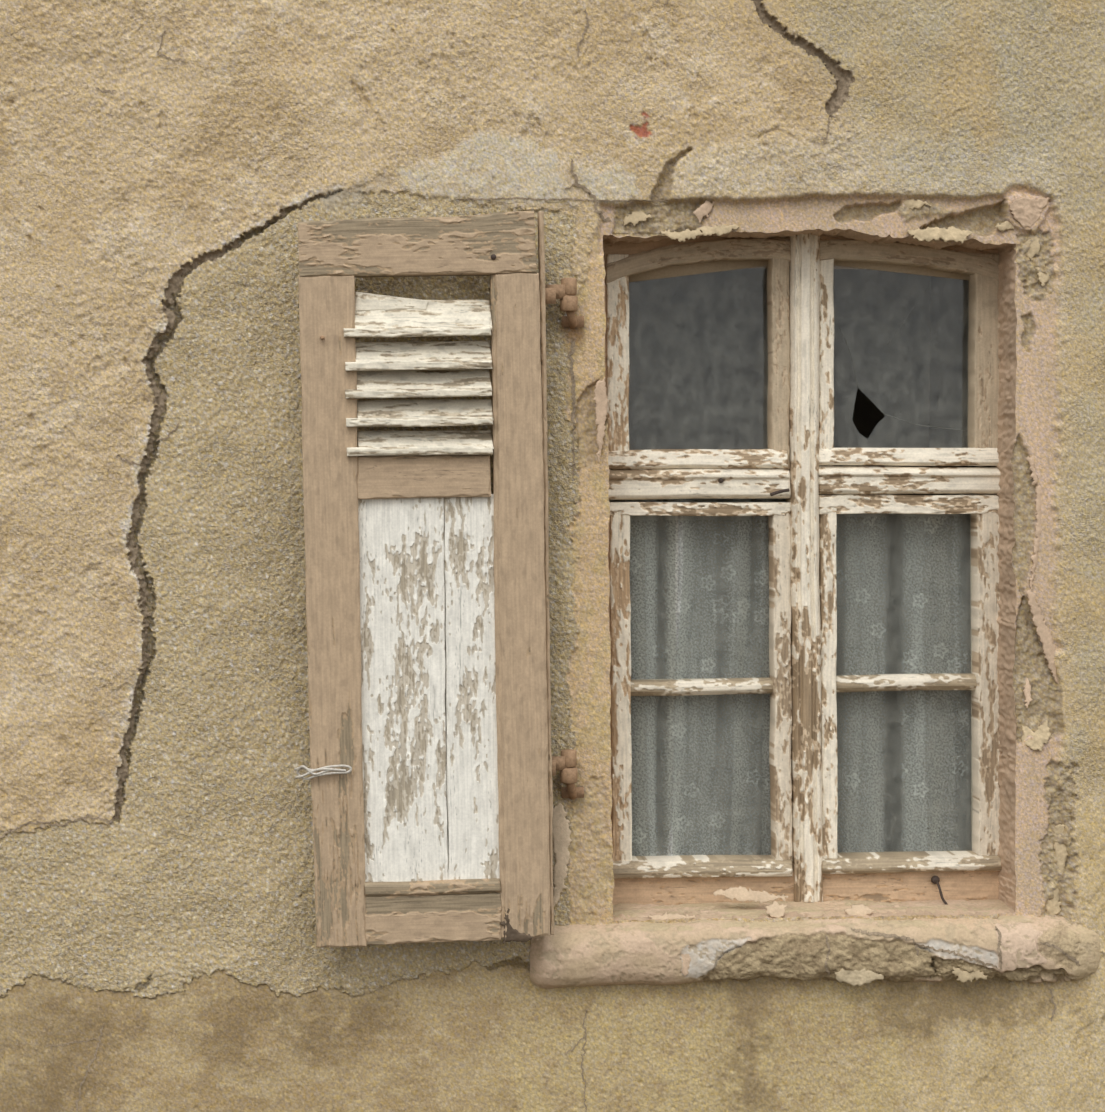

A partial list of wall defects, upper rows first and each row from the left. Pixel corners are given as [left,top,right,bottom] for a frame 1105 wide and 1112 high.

crack [577,9,590,56]
crack [751,0,855,144]
flaking render [613,148,739,242]
flaking render [833,198,931,223]
flaking render [907,197,1056,353]
crack [0,189,342,838]
flaking render [0,190,578,999]
flaking render [545,299,609,756]
flaking render [1010,435,1065,751]
peeling [552,771,1033,933]
flaking render [1038,760,1080,923]
flaking render [0,931,1105,1112]